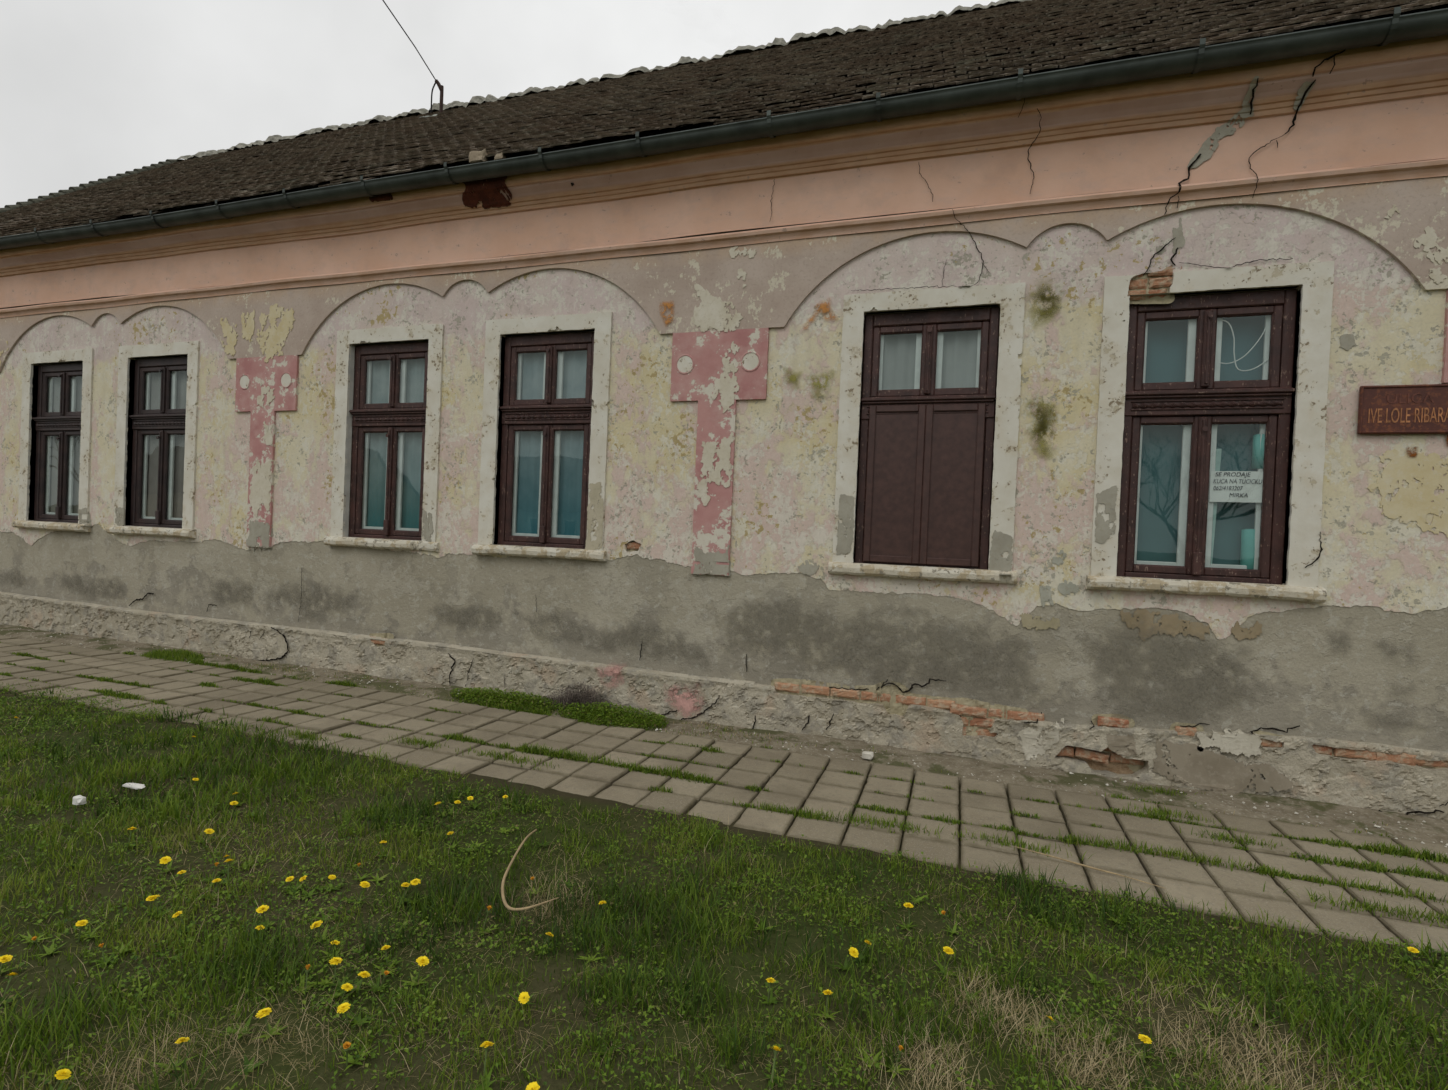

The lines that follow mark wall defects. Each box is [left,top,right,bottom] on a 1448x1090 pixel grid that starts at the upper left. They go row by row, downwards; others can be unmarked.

crack [1143,50,1345,276]
peeling [1413,226,1448,284]
peeling [220,303,295,363]
peeling [693,283,743,413]
peeling [246,382,276,552]
peeling [697,432,734,506]
peeling [1367,448,1448,538]
peeling [693,545,731,577]
flaking render [771,678,1044,737]
flaking render [1056,746,1145,773]
flaking render [1253,730,1283,748]
flaking render [1312,744,1448,769]